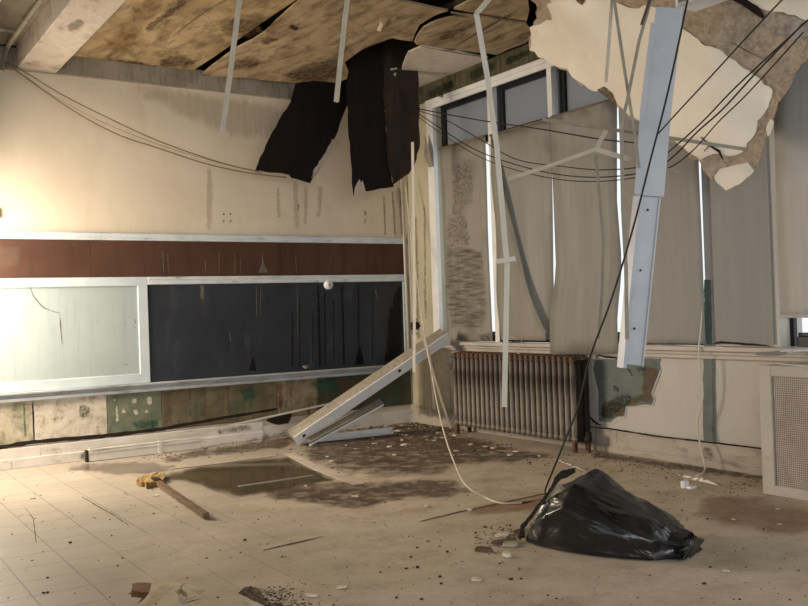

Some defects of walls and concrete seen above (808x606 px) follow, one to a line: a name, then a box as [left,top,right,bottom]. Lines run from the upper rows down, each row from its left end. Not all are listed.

flaking render [759,8,808,40]
damp [288,59,337,82]
damp [471,64,493,79]
flaking render [597,87,617,104]
flaking render [703,94,778,190]
peeling [590,358,662,423]
damp [167,432,294,461]